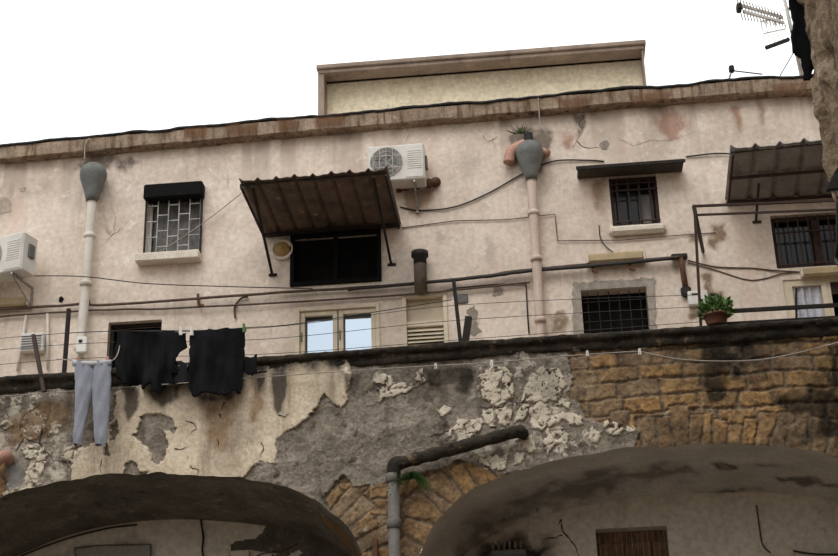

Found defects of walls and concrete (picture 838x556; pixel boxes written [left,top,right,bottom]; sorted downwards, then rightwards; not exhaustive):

peeling [372,368,425,403]
water stain [702,341,728,401]
water stain [778,345,838,436]
peeling [0,410,63,498]
peeling [61,444,83,464]
peeling [103,421,119,457]
peeling [123,460,147,475]
peeling [131,413,177,465]
peeling [244,464,264,481]
spalling [399,336,838,556]
peeling [230,526,347,556]
spalling [324,475,388,556]